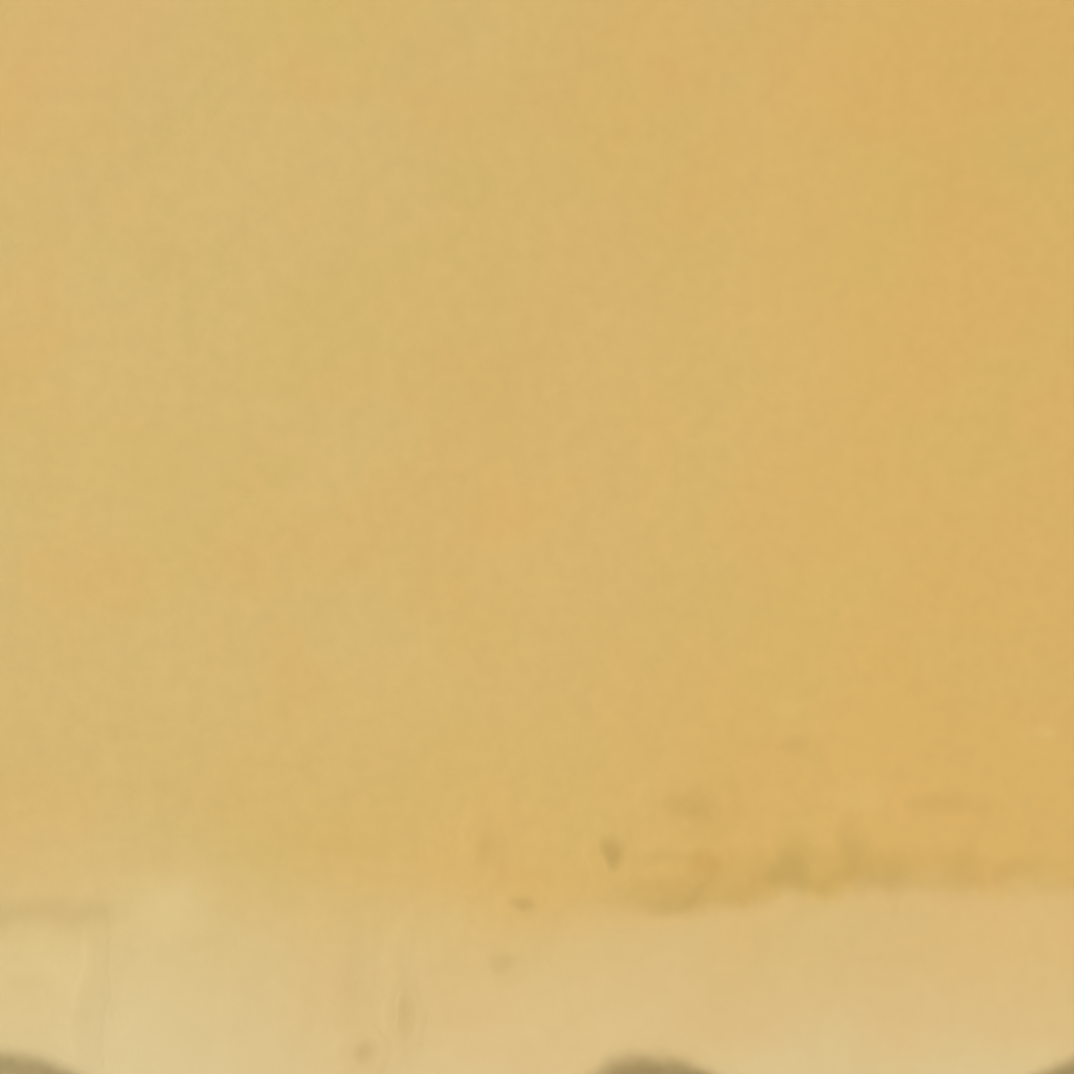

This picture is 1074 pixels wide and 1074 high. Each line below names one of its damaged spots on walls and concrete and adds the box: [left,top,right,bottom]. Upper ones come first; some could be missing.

leakage [0,782,1074,1074]